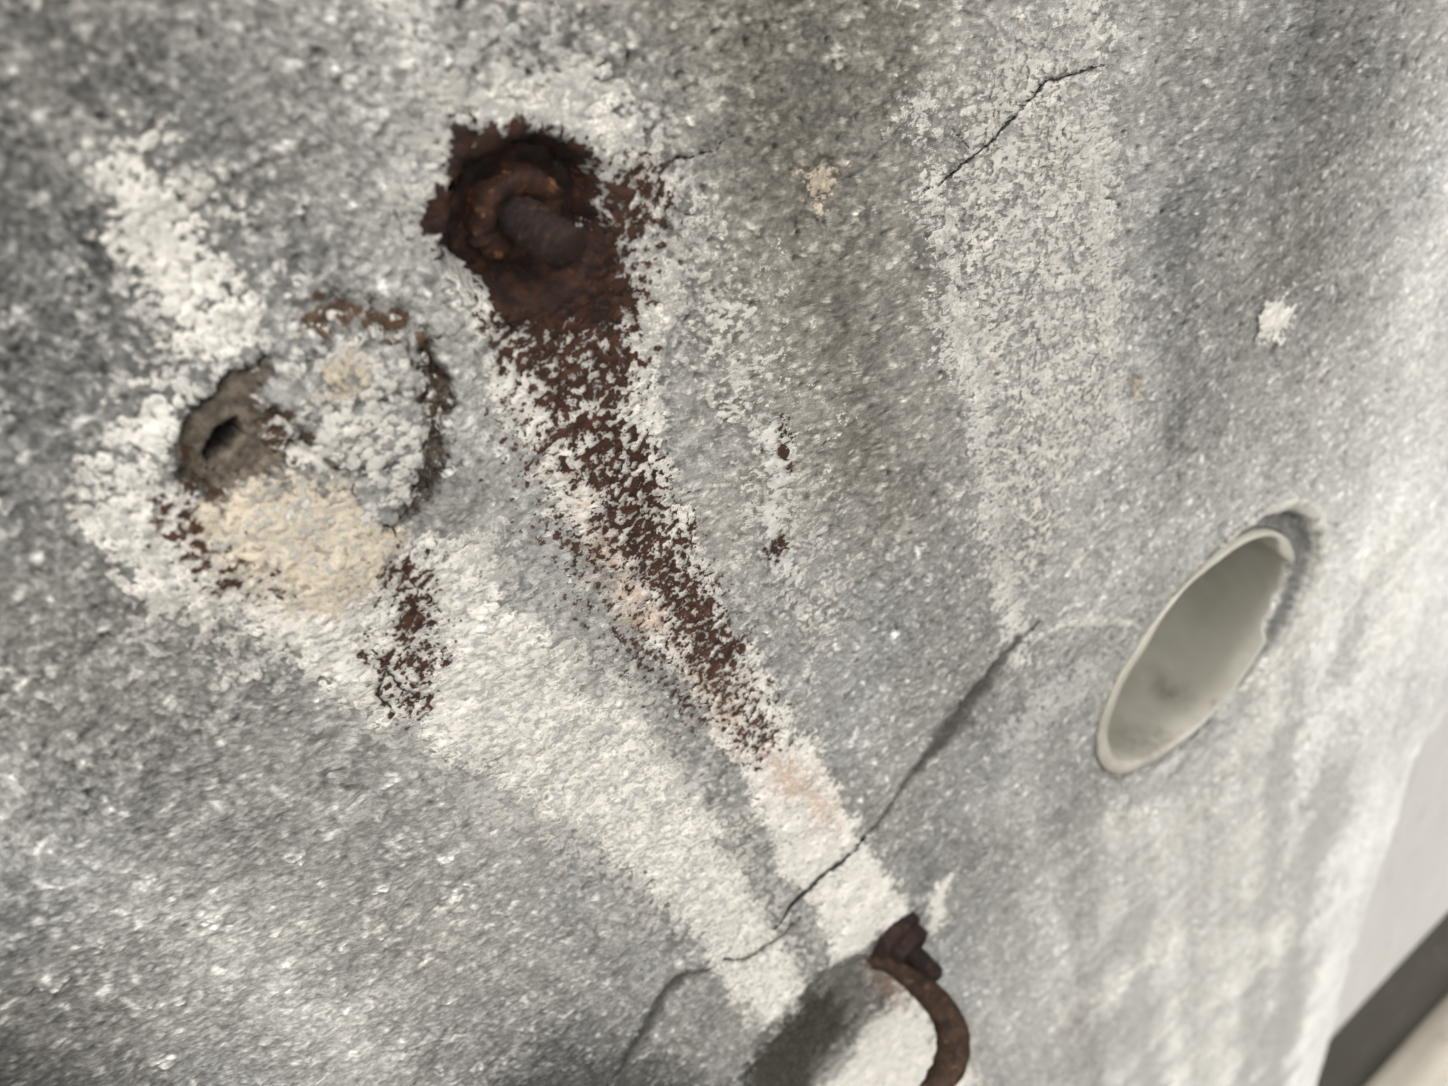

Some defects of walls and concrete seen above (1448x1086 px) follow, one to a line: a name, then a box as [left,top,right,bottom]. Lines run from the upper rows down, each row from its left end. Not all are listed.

crack [927,64,1104,189]
spalling [126,290,466,617]
corrosion [411,111,814,773]
corrosion [355,544,465,730]
crack [607,617,1140,1086]